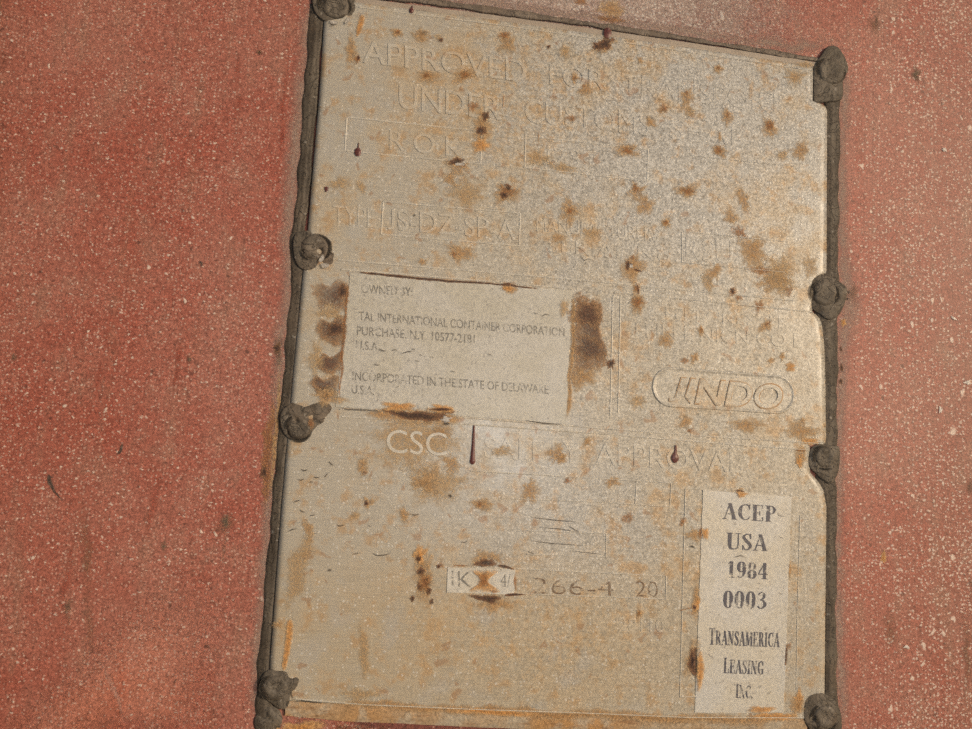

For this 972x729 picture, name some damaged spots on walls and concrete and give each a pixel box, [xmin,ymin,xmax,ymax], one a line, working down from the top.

corrosion [593,38,616,52]
corrosion [470,104,490,152]
corrosion [713,108,734,157]
corrosion [763,120,777,136]
corrosion [495,184,518,201]
corrosion [675,186,697,198]
corrosion [724,189,794,295]
corrosion [361,272,537,293]
corrosion [621,255,645,313]
corrosion [368,402,461,499]
corrosion [410,546,442,604]
corrosion [454,550,525,612]